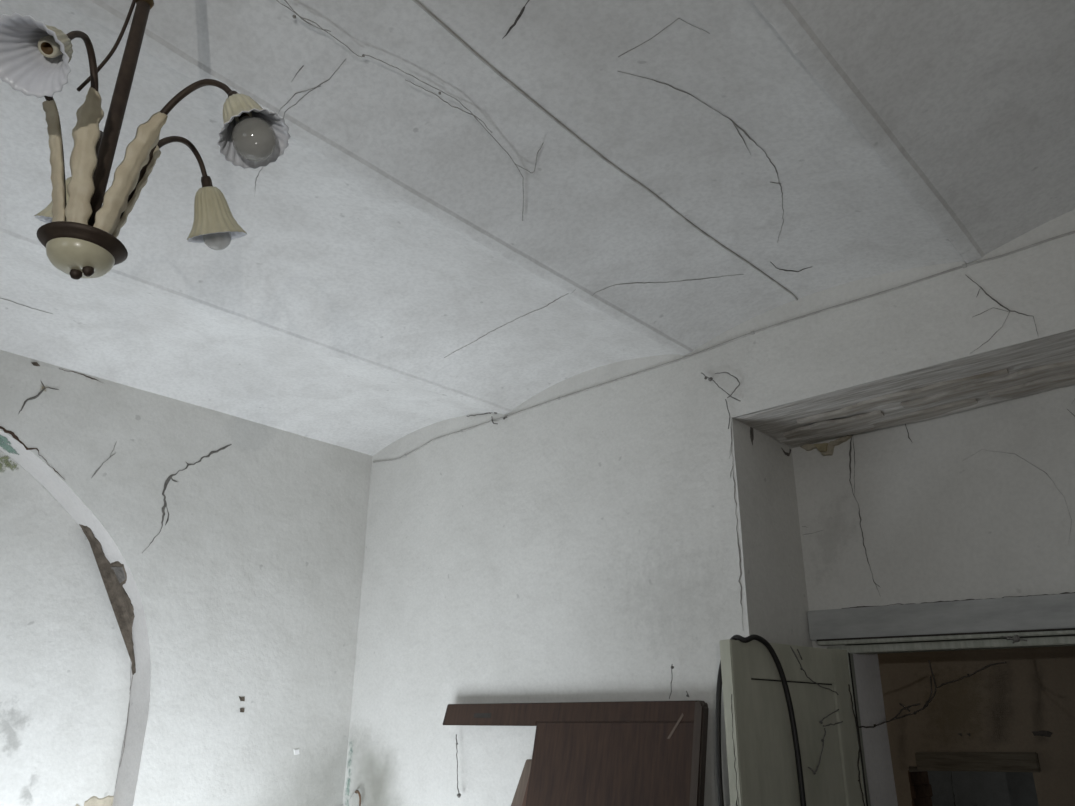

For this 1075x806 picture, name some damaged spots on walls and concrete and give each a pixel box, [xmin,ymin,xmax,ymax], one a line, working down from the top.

crack [502,0,529,39]
crack [278,59,346,119]
crack [618,18,784,238]
crack [966,275,1038,353]
crack [143,444,232,552]
crack [729,428,743,624]
crack [841,437,1075,609]
spalling [79,524,136,675]
peeling [75,795,114,806]